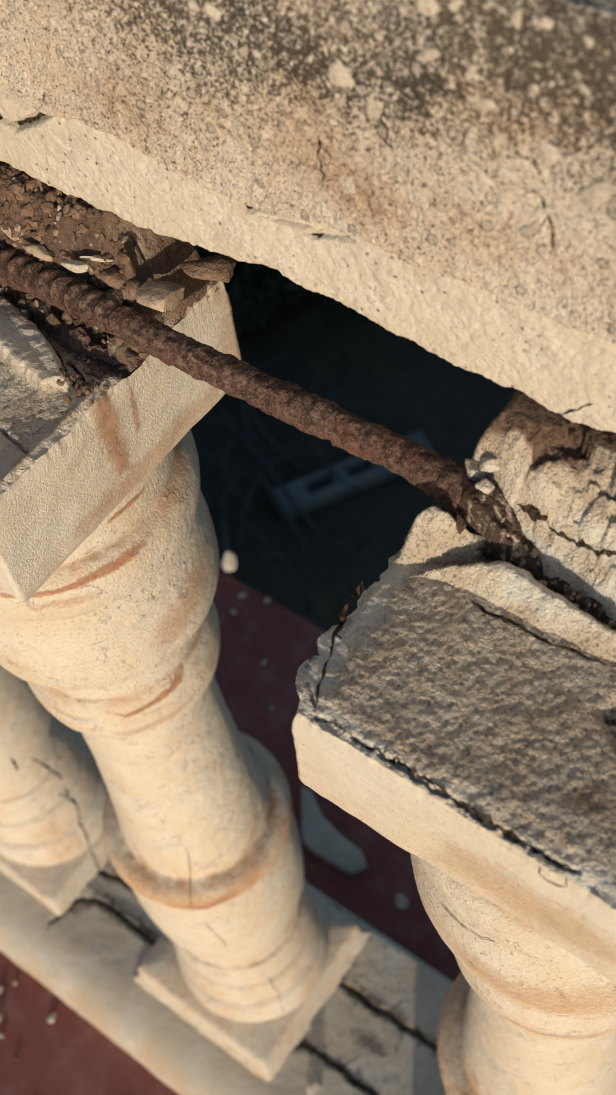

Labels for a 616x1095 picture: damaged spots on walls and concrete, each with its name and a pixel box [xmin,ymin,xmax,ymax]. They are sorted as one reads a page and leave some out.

crack [0,112,45,125]
crack [308,116,331,180]
spalling [0,186,219,325]
crack [533,195,554,250]
spalling [0,283,142,372]
corrosion [88,390,129,476]
corrosion [32,539,145,598]
corrosion [109,489,144,522]
spalling [392,389,616,663]
crack [469,598,616,668]
crack [314,581,577,872]
crack [11,758,154,944]